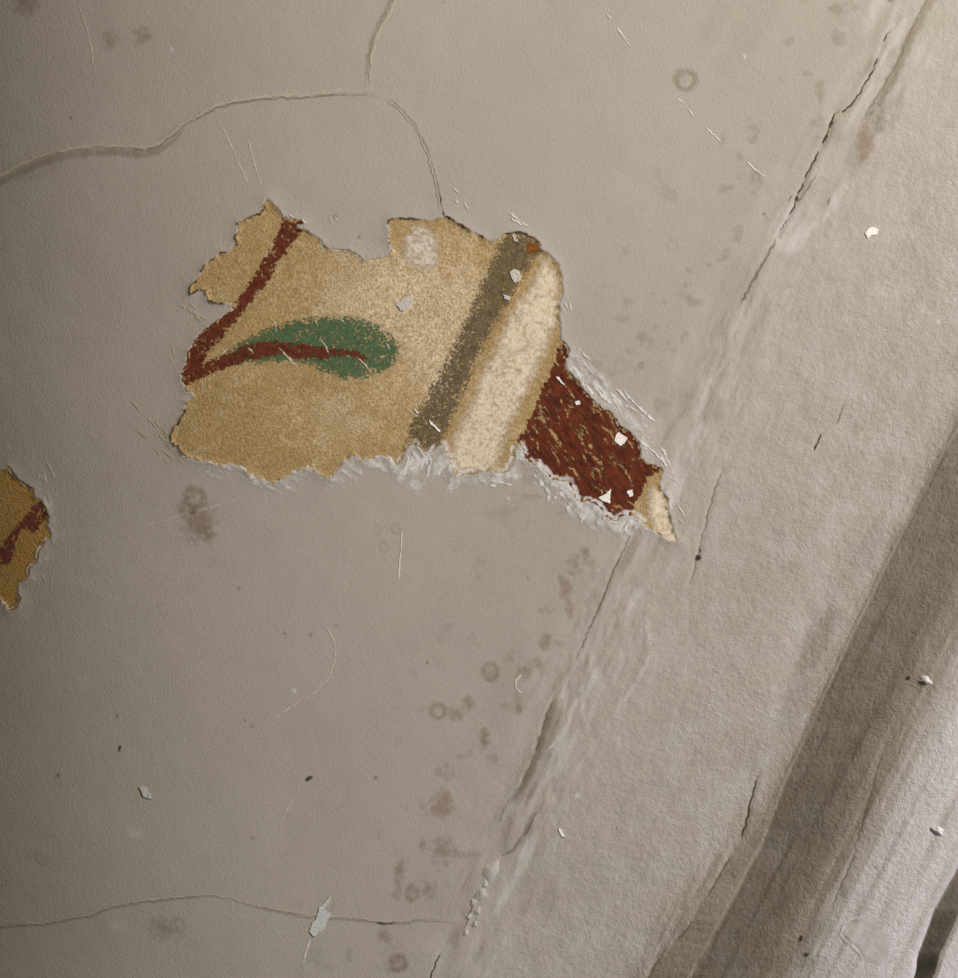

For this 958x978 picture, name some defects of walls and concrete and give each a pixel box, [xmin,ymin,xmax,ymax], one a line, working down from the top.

crack [0,0,396,176]
peeling [153,200,684,541]
peeling [0,467,51,610]